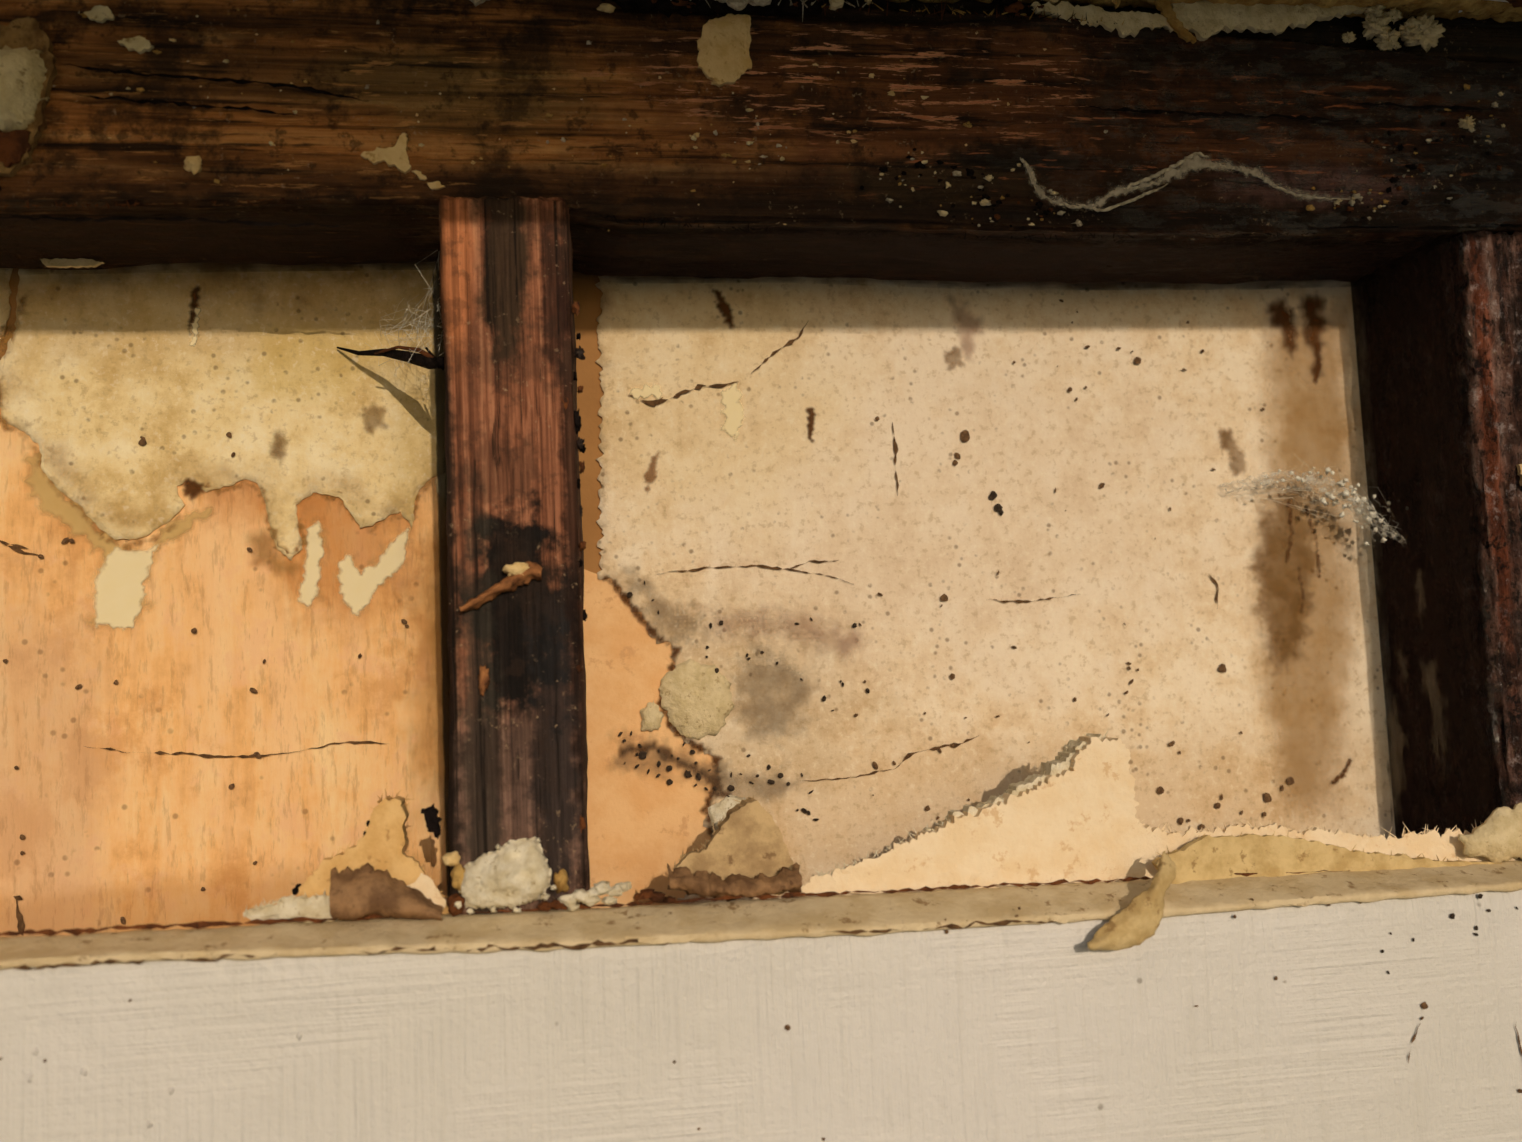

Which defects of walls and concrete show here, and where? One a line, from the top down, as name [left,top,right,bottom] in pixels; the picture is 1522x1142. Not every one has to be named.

crack [629,323,807,438]
leakage [1212,431,1238,473]
leakage [1254,297,1341,816]
crack [662,560,854,585]
peeling [0,408,447,937]
crack [88,741,385,758]
peeling [1268,896,1331,907]
peeling [18,955,90,965]
peeling [149,950,231,960]
peeling [428,941,494,952]
peeling [624,933,707,945]